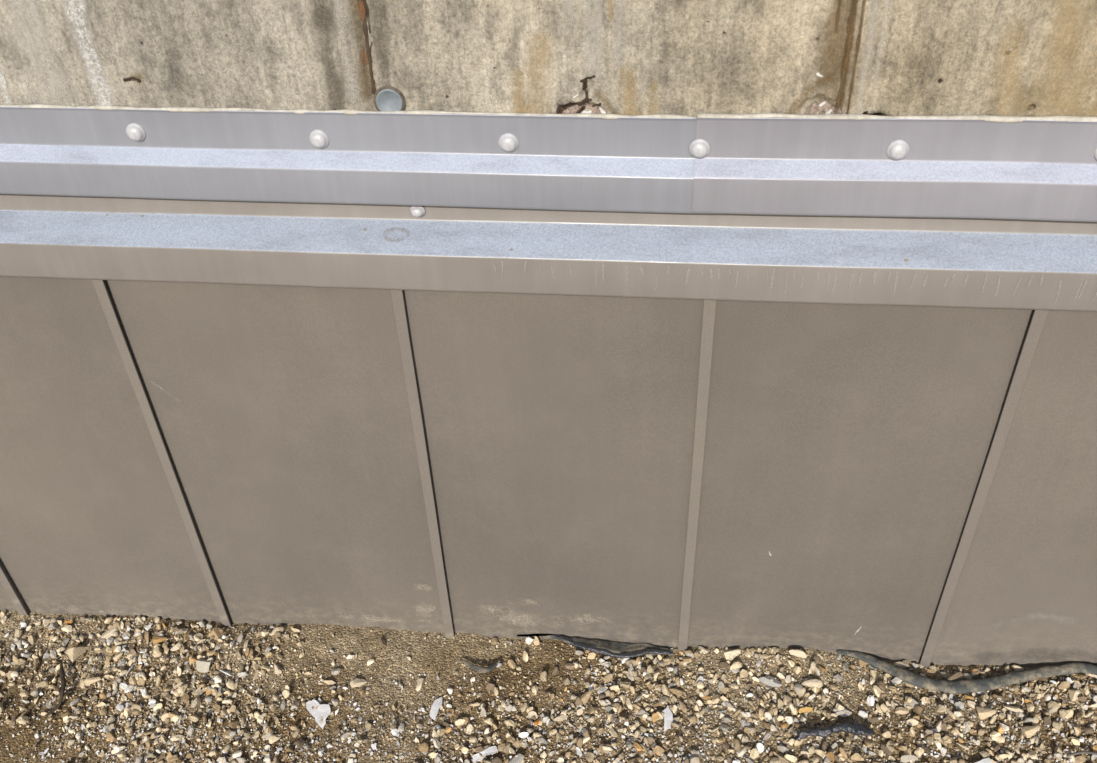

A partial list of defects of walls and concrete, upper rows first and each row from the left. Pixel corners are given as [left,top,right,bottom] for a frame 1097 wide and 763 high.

spalling [551,75,616,114]